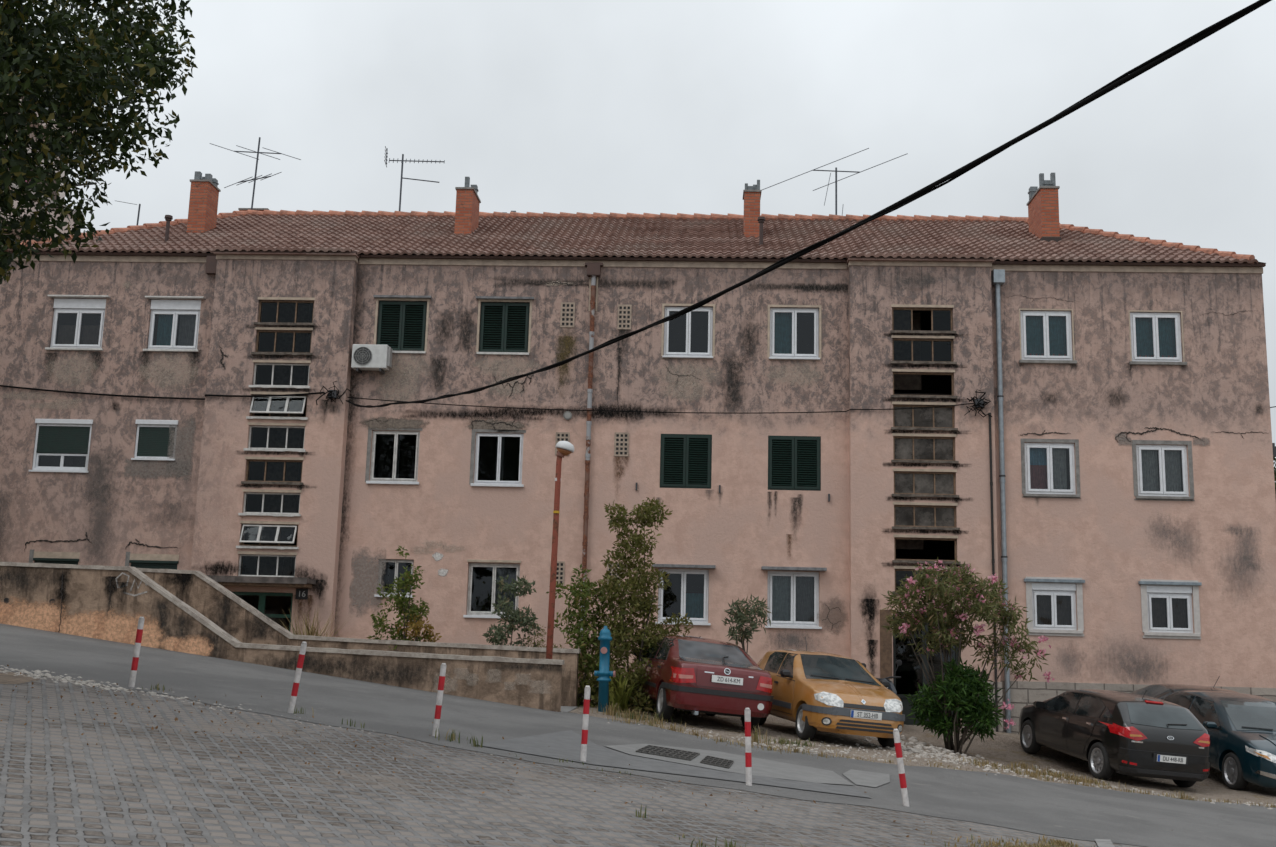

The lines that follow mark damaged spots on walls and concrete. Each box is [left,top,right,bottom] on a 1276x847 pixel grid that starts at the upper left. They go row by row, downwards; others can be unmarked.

crack [1024,428,1071,436]
crack [1115,427,1268,442]
crack [24,532,92,632]
leakage [105,576,128,604]
crack [107,539,177,615]
leakage [167,574,192,594]
leakage [157,598,234,658]
leakage [249,614,275,638]